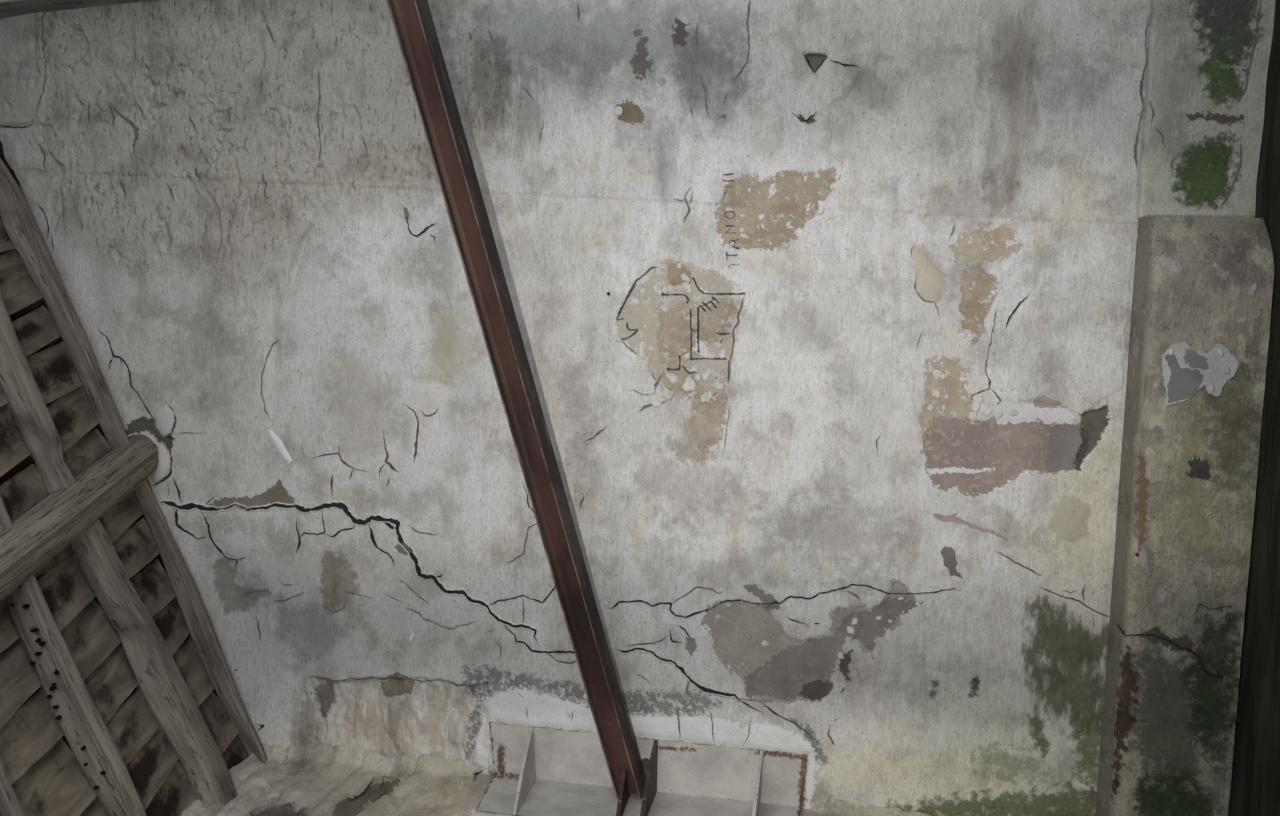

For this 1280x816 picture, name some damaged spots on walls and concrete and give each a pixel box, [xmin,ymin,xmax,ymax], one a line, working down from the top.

crack [1134,15,1176,171]
spalling [714,167,840,251]
spalling [949,221,1022,344]
crack [98,329,577,664]
spalling [607,259,741,464]
peeling [919,356,1085,498]
peeling [1162,341,1239,405]
crack [309,672,483,686]
crack [610,584,957,746]
spalling [686,579,923,704]
crack [995,551,1236,679]
rust [1110,646,1138,797]